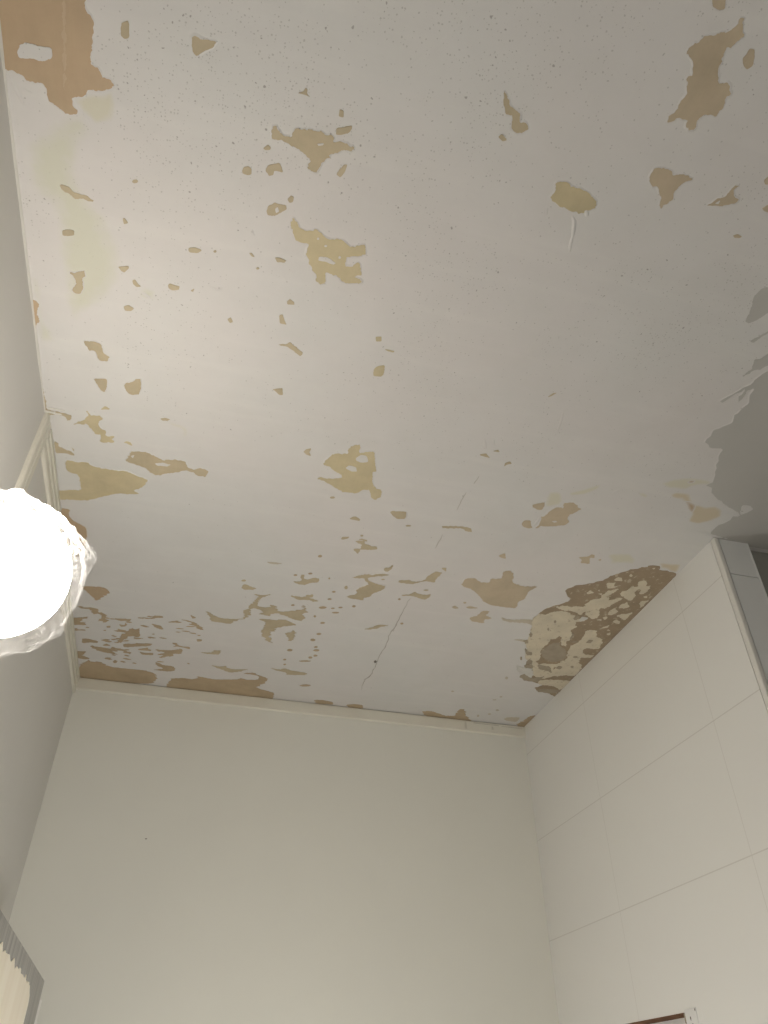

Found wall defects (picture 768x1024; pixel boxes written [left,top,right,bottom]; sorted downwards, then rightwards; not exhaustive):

peeling [0,0,116,116]
peeling [665,16,755,133]
peeling [263,110,355,177]
peeling [267,196,367,285]
peeling [549,180,598,215]
peeling [647,166,693,209]
peeling [43,391,209,557]
peeling [317,444,383,500]
peeling [522,502,582,529]
peeling [704,354,768,550]
peeling [74,565,446,699]
peeling [452,554,537,625]